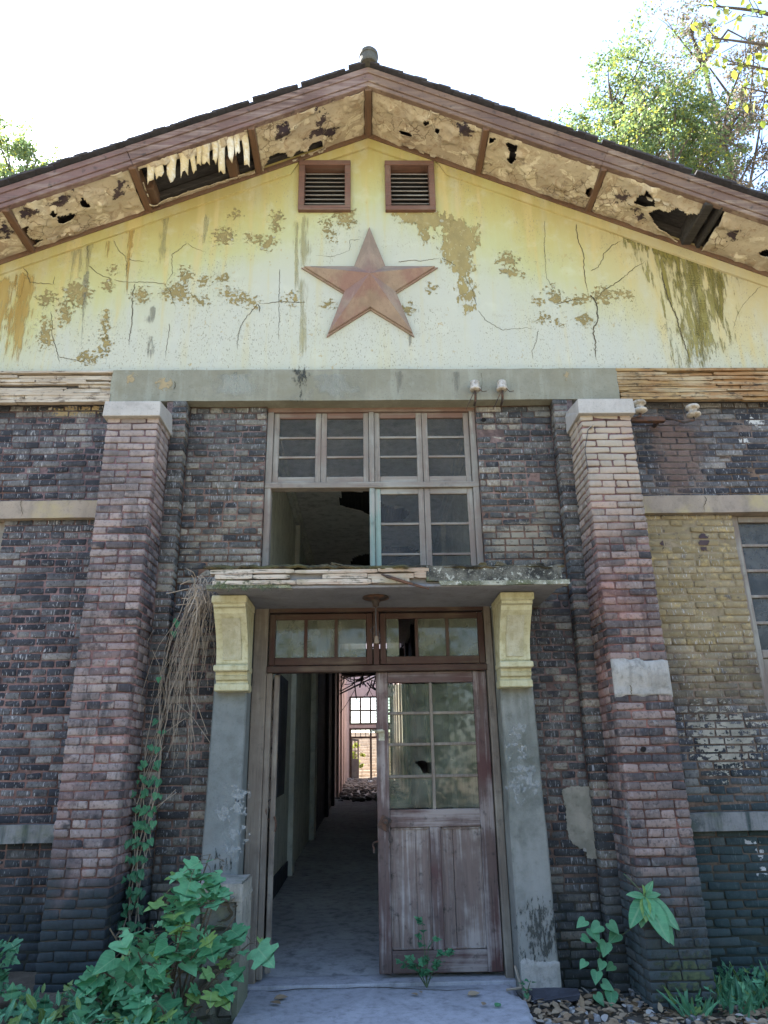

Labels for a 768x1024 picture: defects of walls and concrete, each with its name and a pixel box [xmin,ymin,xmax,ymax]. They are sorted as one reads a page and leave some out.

damp [0,273,35,357]
peeling [35,264,118,351]
peeling [75,309,114,366]
crack [87,241,199,352]
peeling [128,265,261,309]
peeling [211,208,286,253]
crack [237,271,305,341]
peeling [318,209,358,243]
peeling [391,211,481,316]
peeling [494,251,525,279]
crack [544,221,690,362]
damp [623,237,735,368]